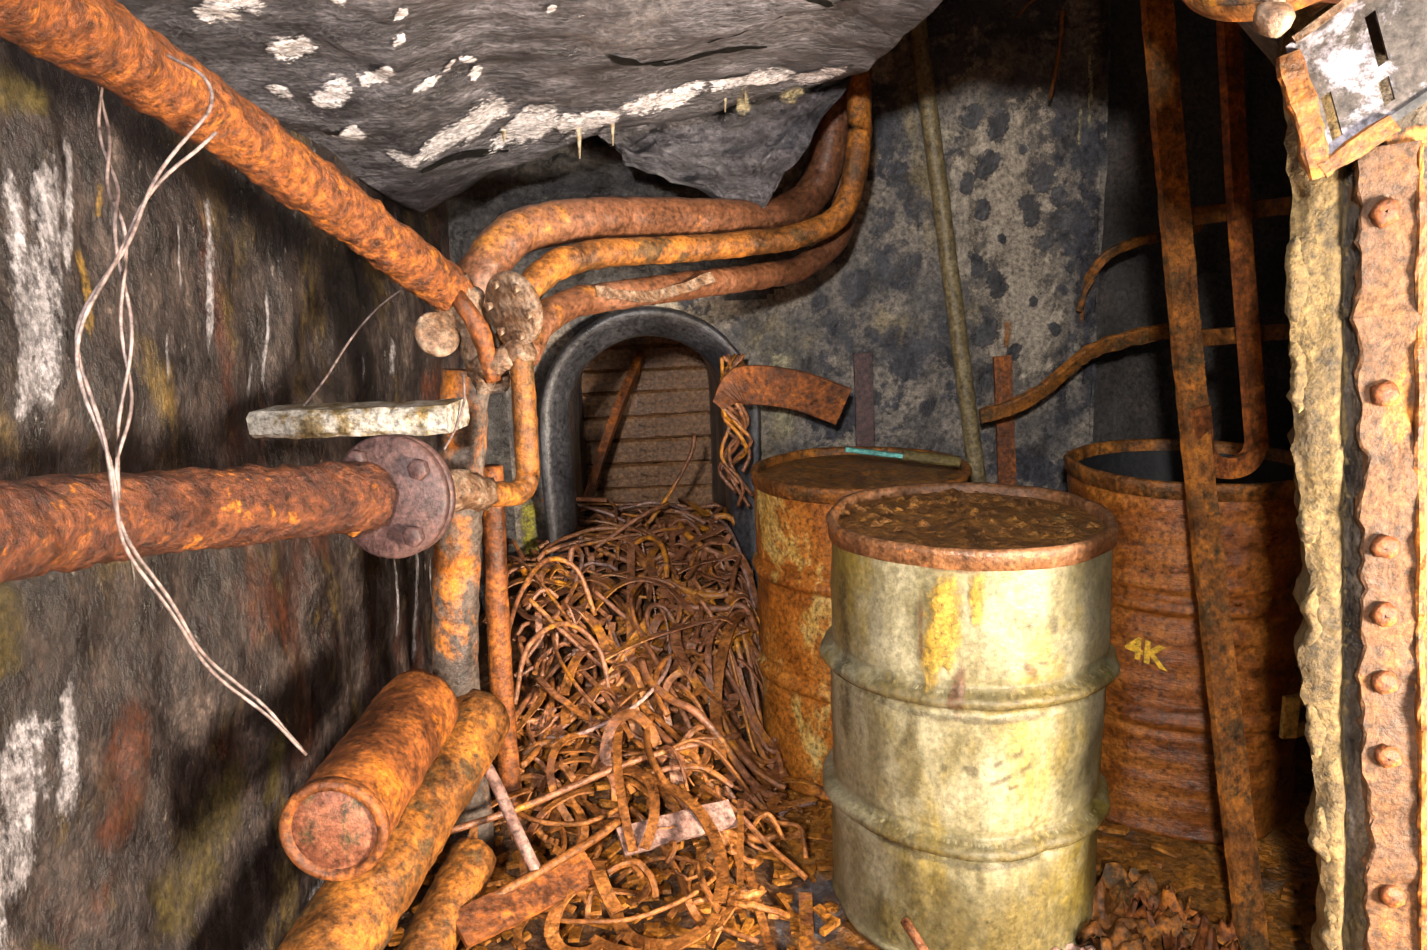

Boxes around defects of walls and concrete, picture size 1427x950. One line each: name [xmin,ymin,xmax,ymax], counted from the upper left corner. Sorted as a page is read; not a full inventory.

leakage [192,0,267,24]
efflorescence [265,35,318,64]
leakage [393,8,408,47]
crack [604,0,845,67]
efflorescence [265,84,292,99]
rust [1384,127,1427,146]
leakage [869,207,895,241]
leakage [1053,54,1101,424]
efflorescence [3,142,73,417]
leakage [812,246,871,337]
leakage [772,352,794,368]
leakage [919,397,937,417]